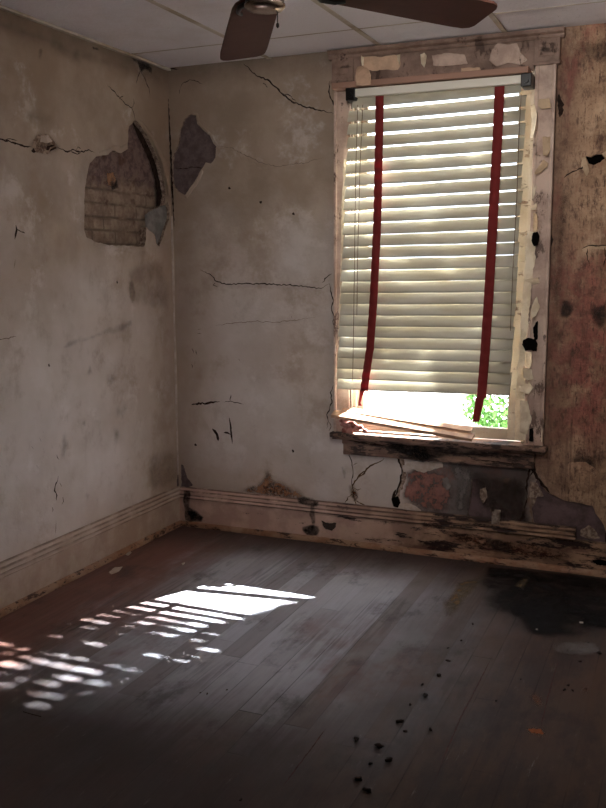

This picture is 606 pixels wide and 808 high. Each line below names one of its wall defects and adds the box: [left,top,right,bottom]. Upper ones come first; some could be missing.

crack [240,64,334,120]
peeling [355,55,401,86]
peeling [420,53,481,72]
peeling [489,43,527,66]
crack [57,146,93,154]
spalling [84,111,218,254]
crack [199,270,334,325]
peeling [514,98,551,442]
crack [192,396,241,405]
crack [345,440,407,508]
damp [246,476,318,535]
damp [481,567,606,636]